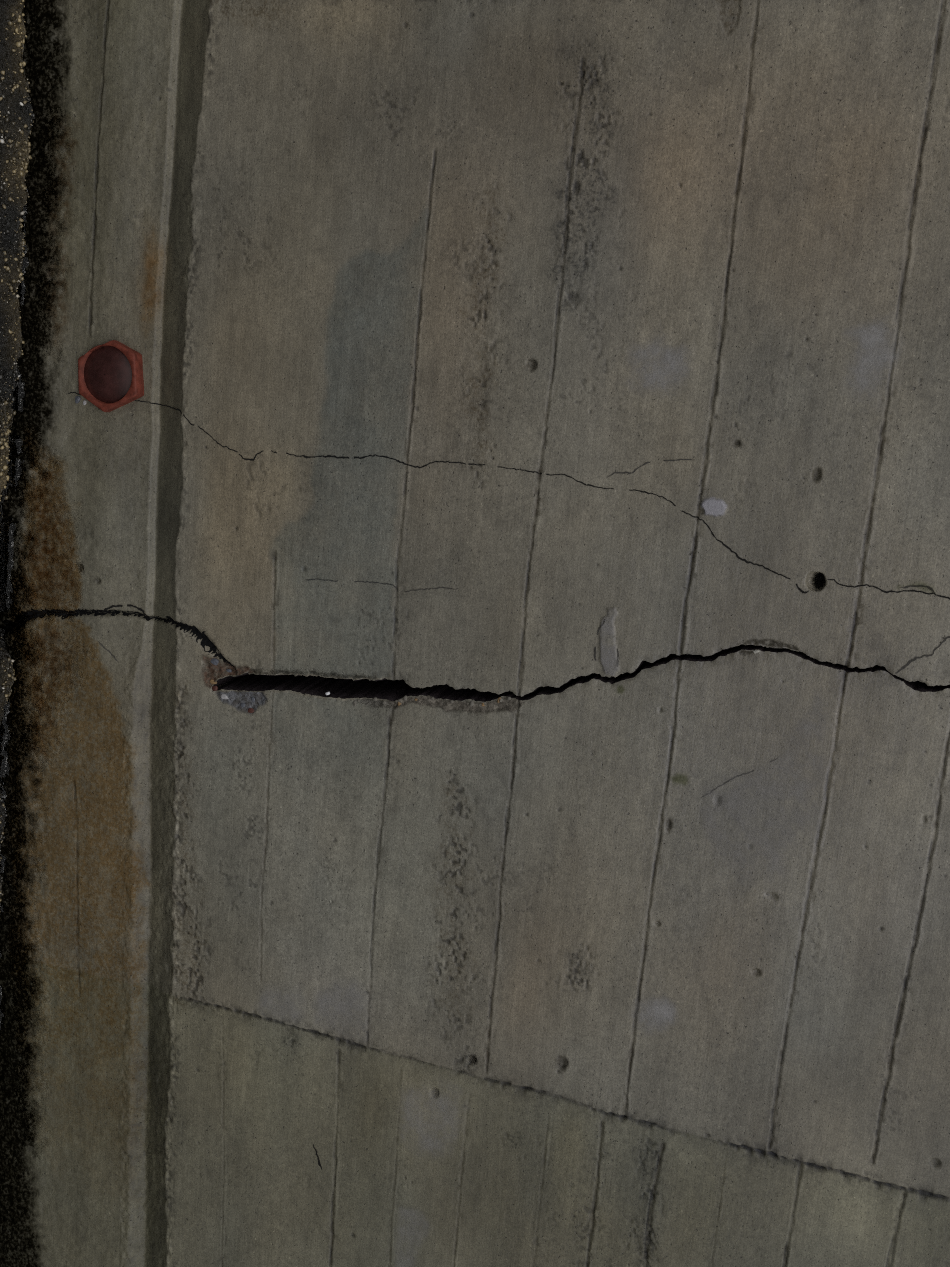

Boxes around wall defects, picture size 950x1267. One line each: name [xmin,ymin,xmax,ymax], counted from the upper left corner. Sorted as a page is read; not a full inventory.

crack [134,400,950,599]
spalling [202,656,267,713]
crack [5,604,950,713]